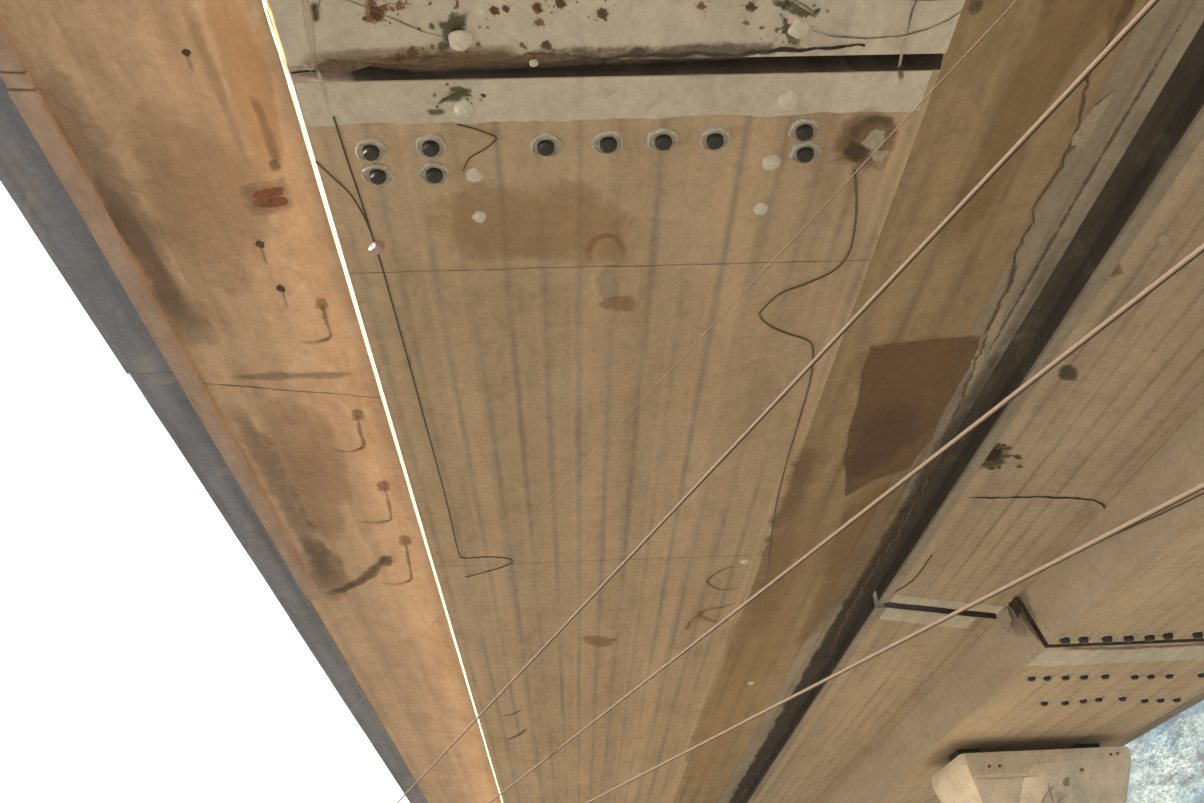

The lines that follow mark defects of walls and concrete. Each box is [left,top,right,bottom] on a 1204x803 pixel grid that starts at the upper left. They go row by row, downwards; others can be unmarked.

rust [352,0,413,28]
rust [485,1,514,20]
rust [516,0,578,52]
rust [588,0,615,21]
crack [283,0,969,81]
leakage [429,92,463,115]
leakage [730,30,1178,803]
crack [967,496,1106,509]
leakage [334,556,391,592]